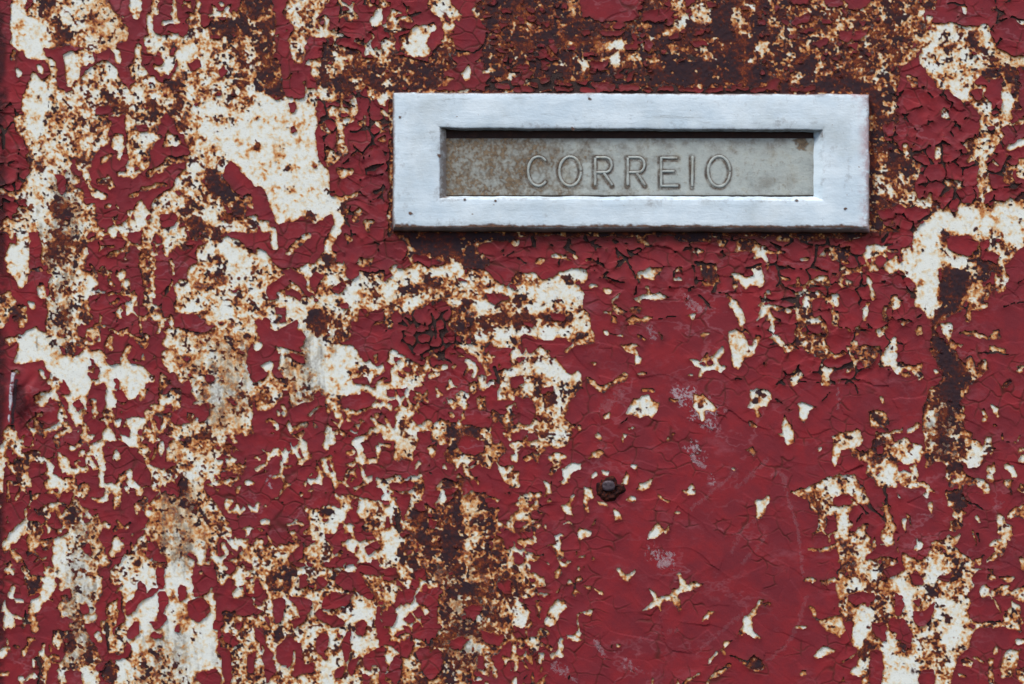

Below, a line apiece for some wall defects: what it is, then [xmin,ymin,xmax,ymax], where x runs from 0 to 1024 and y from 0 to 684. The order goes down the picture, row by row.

corrosion [23,482,197,684]
corrosion [112,352,315,586]
peeling [0,0,726,684]
corrosion [217,466,547,684]
crack [394,507,402,534]
crack [386,295,500,384]
corrosion [0,0,1024,457]
crack [488,85,1021,403]
peeling [778,401,816,445]
crack [856,487,888,522]
peeling [790,368,1024,684]
corrosion [800,227,1024,683]